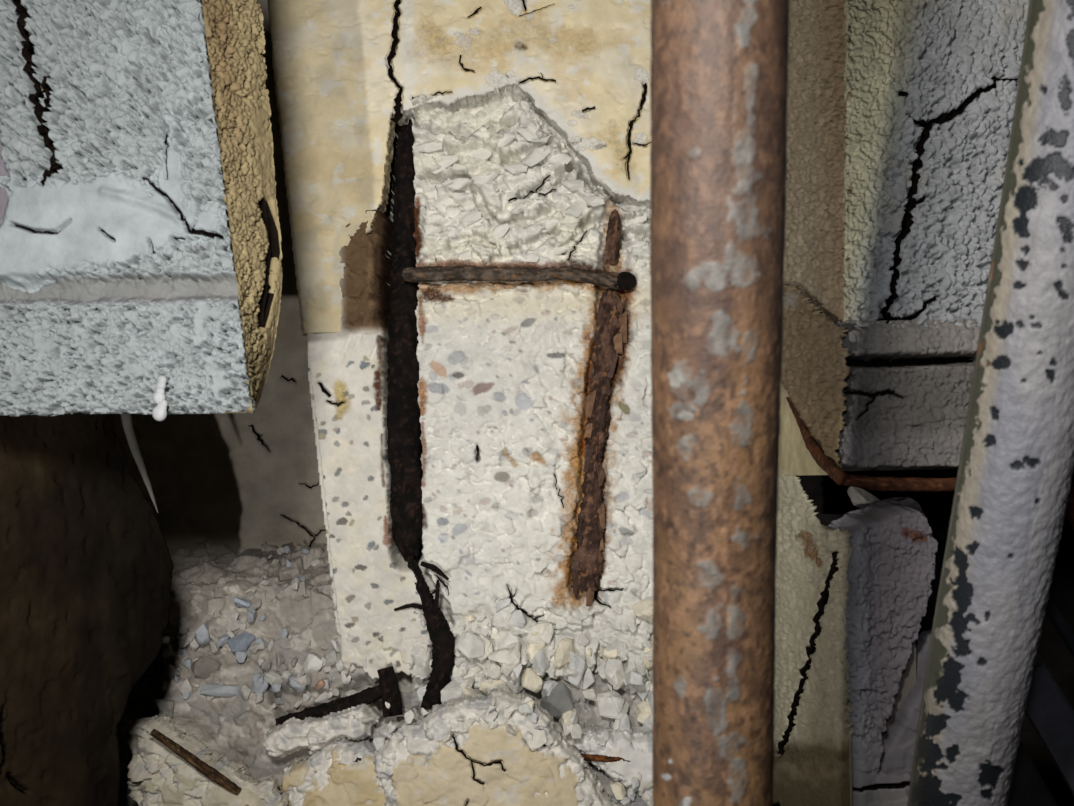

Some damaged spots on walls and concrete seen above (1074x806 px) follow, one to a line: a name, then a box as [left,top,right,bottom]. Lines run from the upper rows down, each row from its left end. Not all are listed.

crack [12,0,63,186]
crack [387,0,475,124]
crack [519,0,555,16]
crack [518,72,556,84]
crack [623,83,651,179]
crack [852,76,1018,328]
rust [373,335,386,410]
spalling [306,71,653,702]
rust [413,198,631,607]
crack [777,552,839,756]